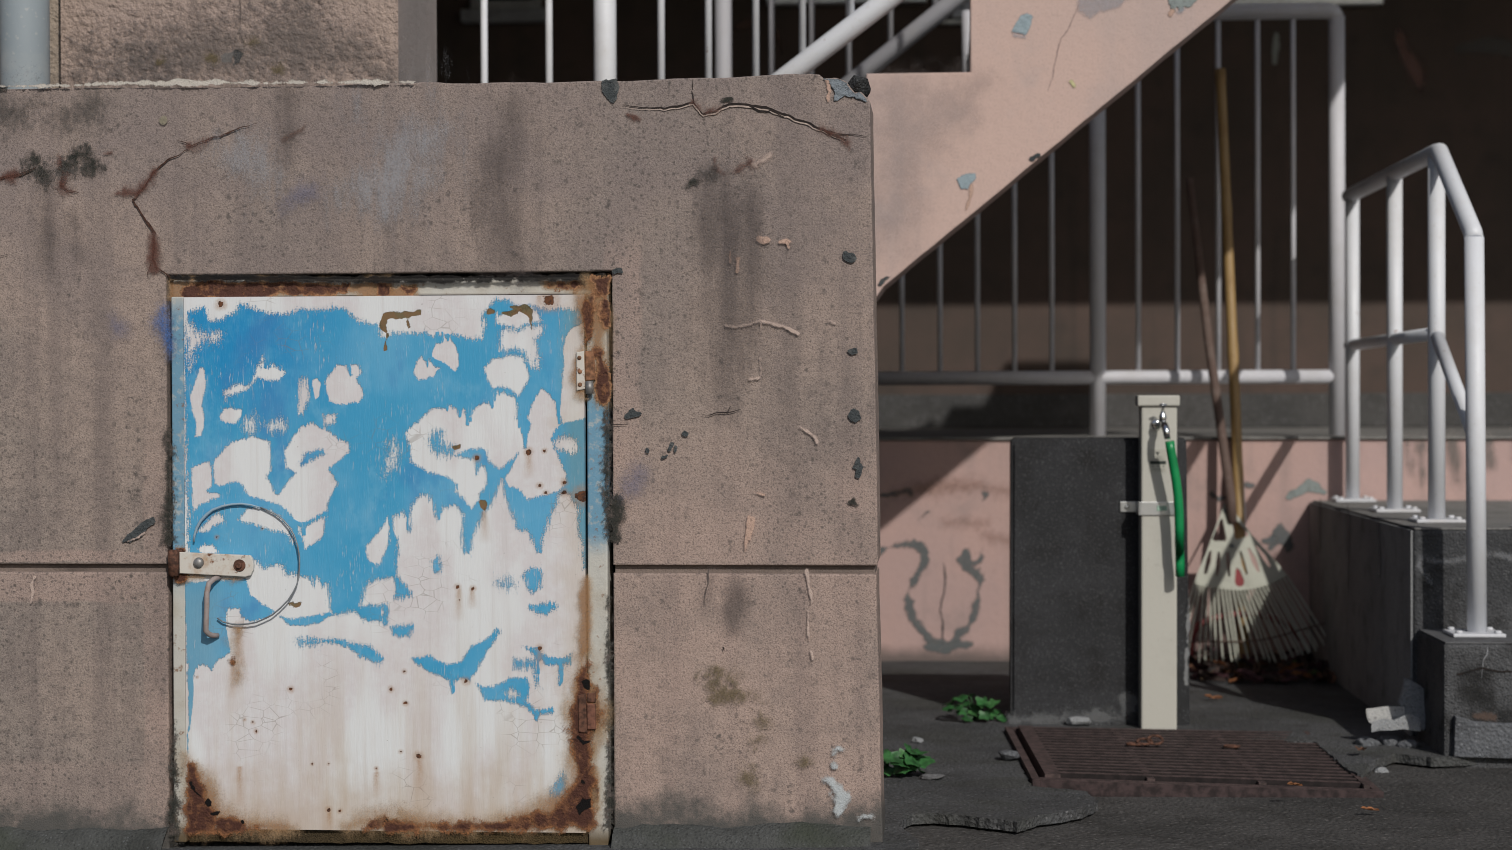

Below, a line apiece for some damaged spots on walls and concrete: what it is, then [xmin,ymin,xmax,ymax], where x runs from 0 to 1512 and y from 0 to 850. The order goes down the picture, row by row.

crack [1050,4,1080,83]
peeling [1168,0,1197,17]
mould [0,91,106,190]
crack [626,83,862,150]
crack [0,123,256,279]
corrosion [169,279,418,298]
corrosion [345,577,609,838]
spalling [1353,678,1426,748]
corrosion [181,755,293,838]